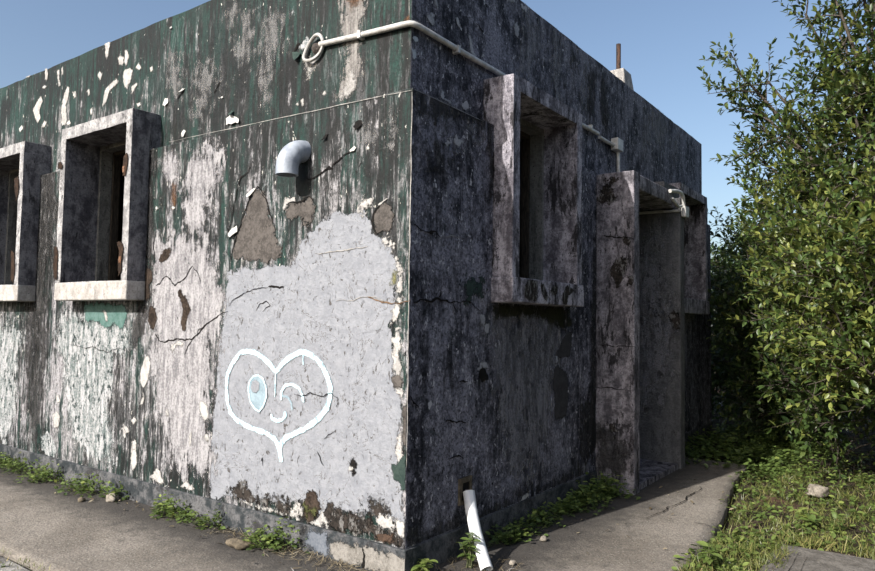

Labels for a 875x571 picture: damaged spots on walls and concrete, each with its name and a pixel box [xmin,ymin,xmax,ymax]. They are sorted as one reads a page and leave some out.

peeling [33,67,76,127]
peeling [90,42,153,115]
leakage [336,0,368,102]
leakage [21,172,59,452]
peeling [41,301,137,473]
leakage [131,135,227,482]
spalling [178,289,191,331]
crack [155,285,284,354]
peeling [357,194,404,398]
leakage [478,206,634,518]
spalling [242,489,405,571]
leakage [225,479,468,548]